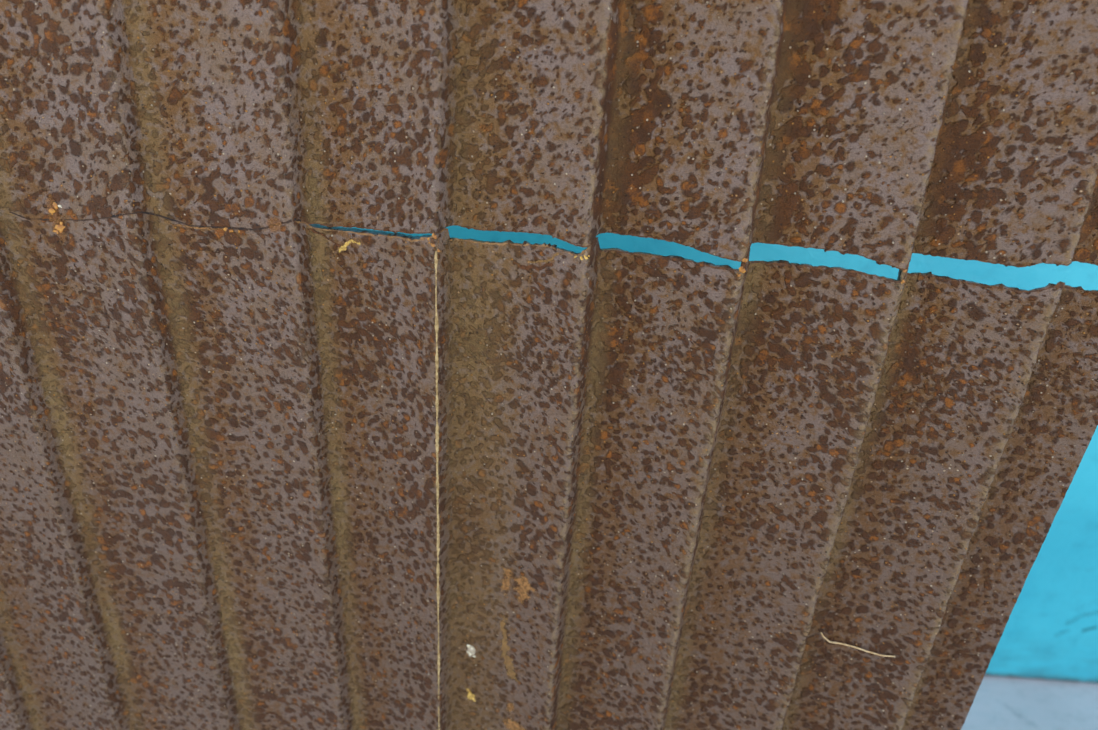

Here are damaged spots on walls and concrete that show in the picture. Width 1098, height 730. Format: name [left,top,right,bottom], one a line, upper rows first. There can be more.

rust [48,202,65,234]
crack [10,211,1098,730]